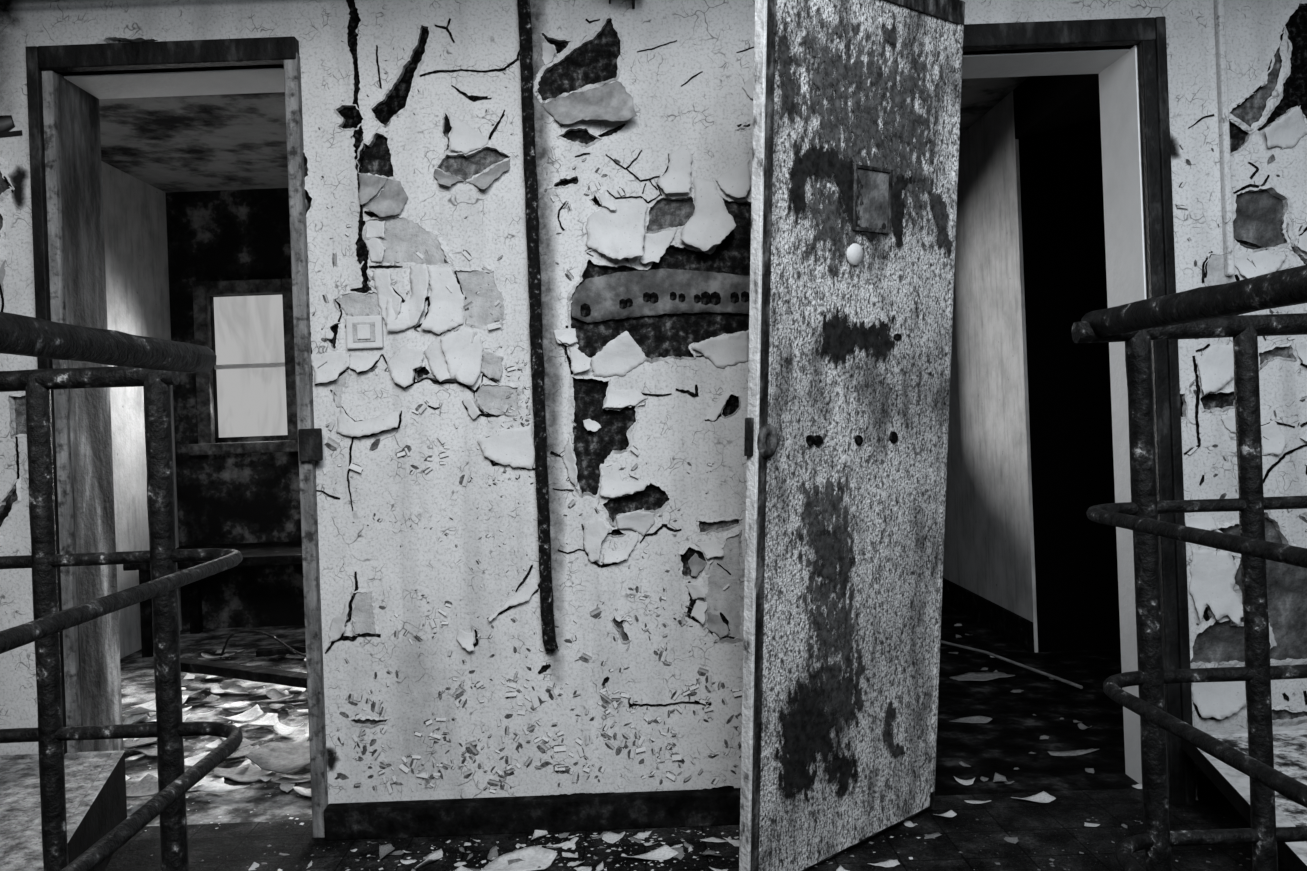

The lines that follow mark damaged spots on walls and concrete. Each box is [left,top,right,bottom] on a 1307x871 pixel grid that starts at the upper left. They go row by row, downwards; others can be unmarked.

crack [346,0,403,294]
crack [420,18,520,140]
peeling [767,0,964,370]
spalling [1189,0,1307,287]
spalling [311,12,769,793]
spalling [1180,344,1236,485]
spalling [1258,336,1307,371]
peeling [1185,515,1240,536]
peeling [771,455,874,801]
spalling [1189,548,1246,720]
spalling [1266,560,1307,666]
peeling [1272,691,1307,727]